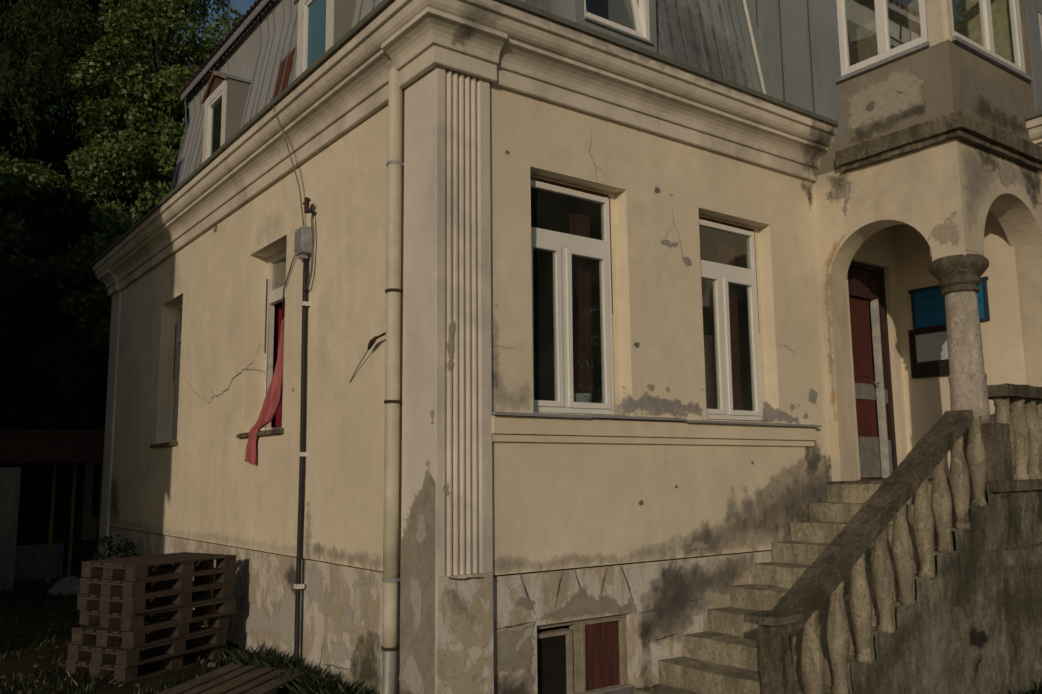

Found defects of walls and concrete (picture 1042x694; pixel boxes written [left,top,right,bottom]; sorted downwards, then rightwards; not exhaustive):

damp [806,128,834,169]
crack [183,344,261,403]
spalling [446,320,455,371]
peeling [614,384,702,417]
damp [684,445,832,550]
peeling [239,561,301,653]
peeling [399,461,449,694]
damp [641,564,737,642]